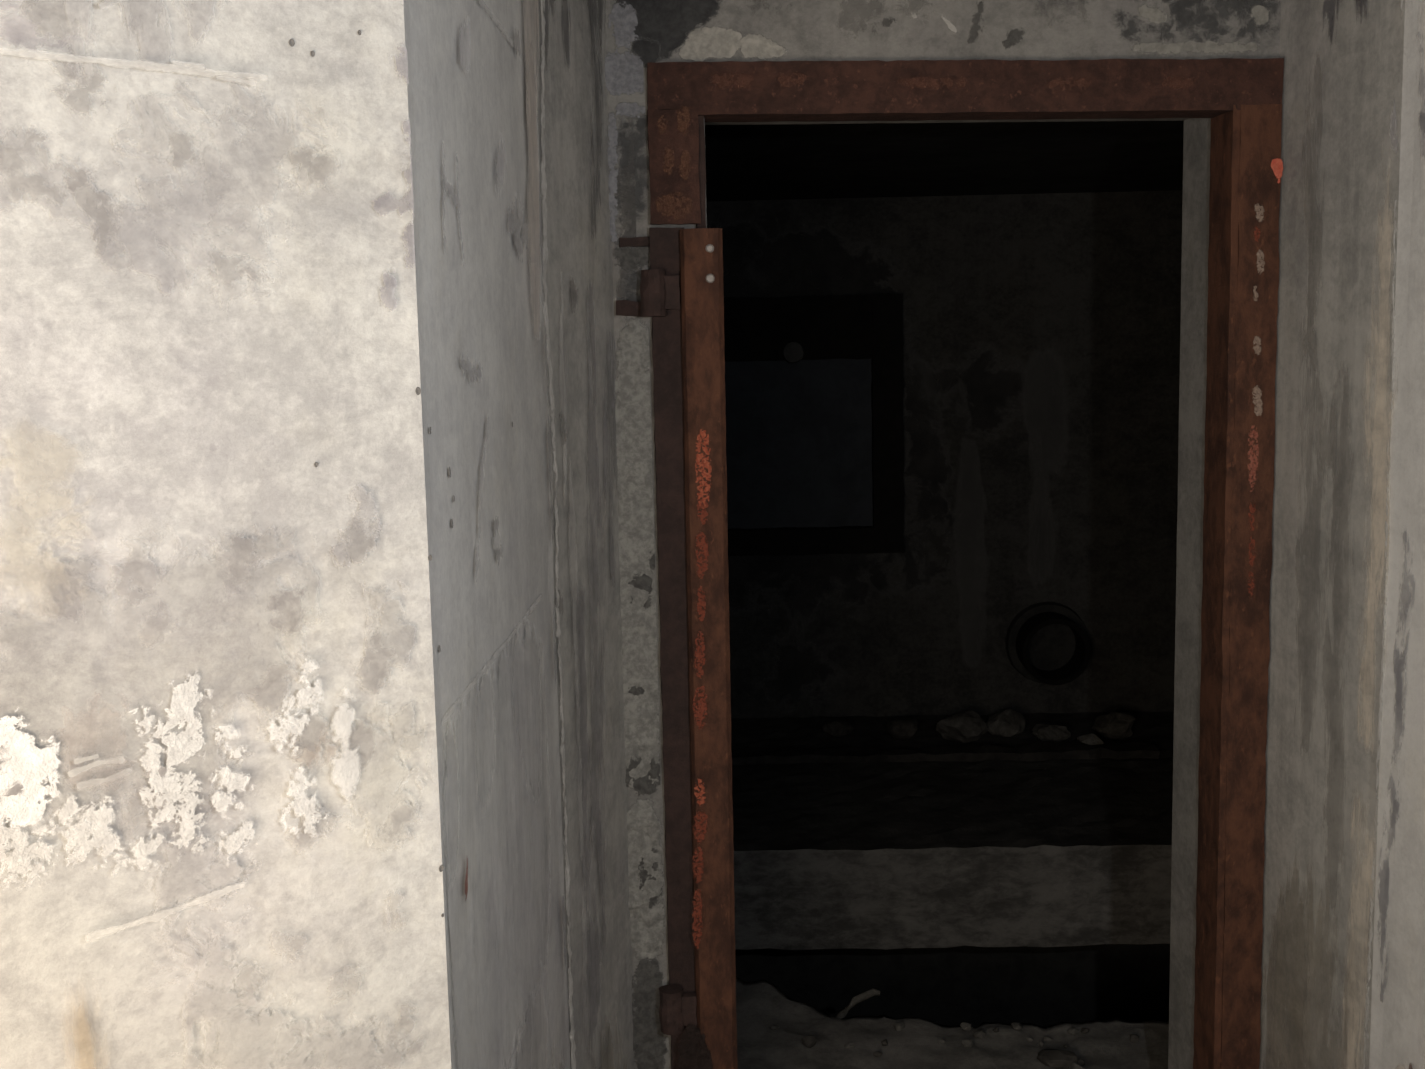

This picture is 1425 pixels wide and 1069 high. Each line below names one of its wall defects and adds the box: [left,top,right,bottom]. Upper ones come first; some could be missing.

peeling [0,674,255,888]
peeling [269,659,359,836]